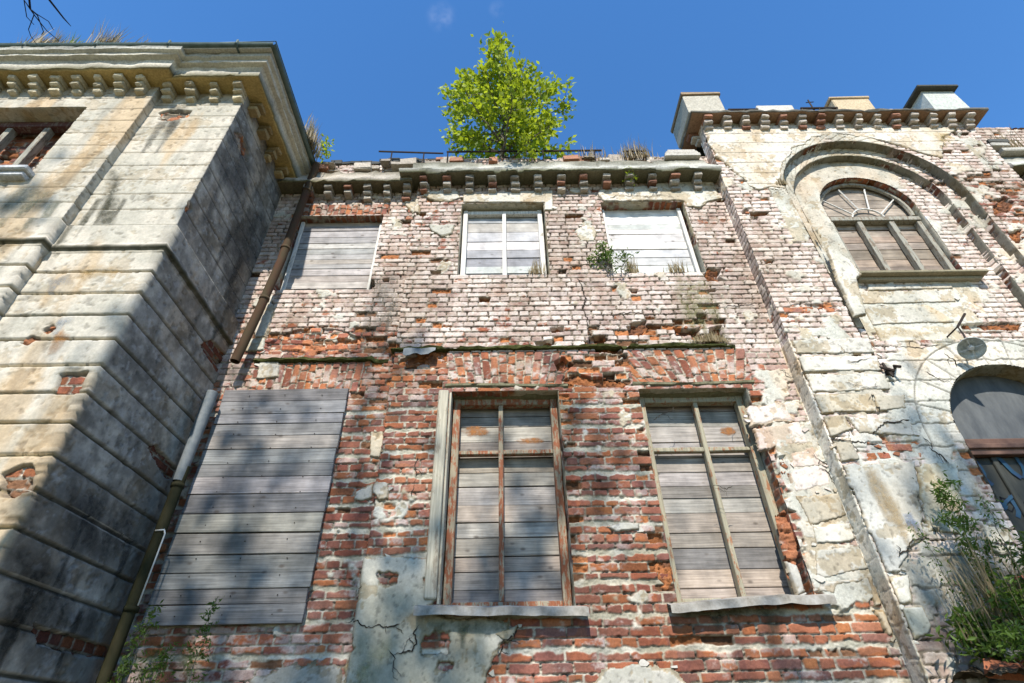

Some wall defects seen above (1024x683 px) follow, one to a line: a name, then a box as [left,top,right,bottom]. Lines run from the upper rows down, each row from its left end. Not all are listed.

damp [57,183,123,244]
spalling [993,199,1013,215]
crack [577,278,595,343]
spalling [57,375,86,395]
spalling [556,361,627,389]
flaking render [743,228,1020,644]
spalling [5,467,36,498]
crack [347,587,418,679]
crack [498,628,518,656]